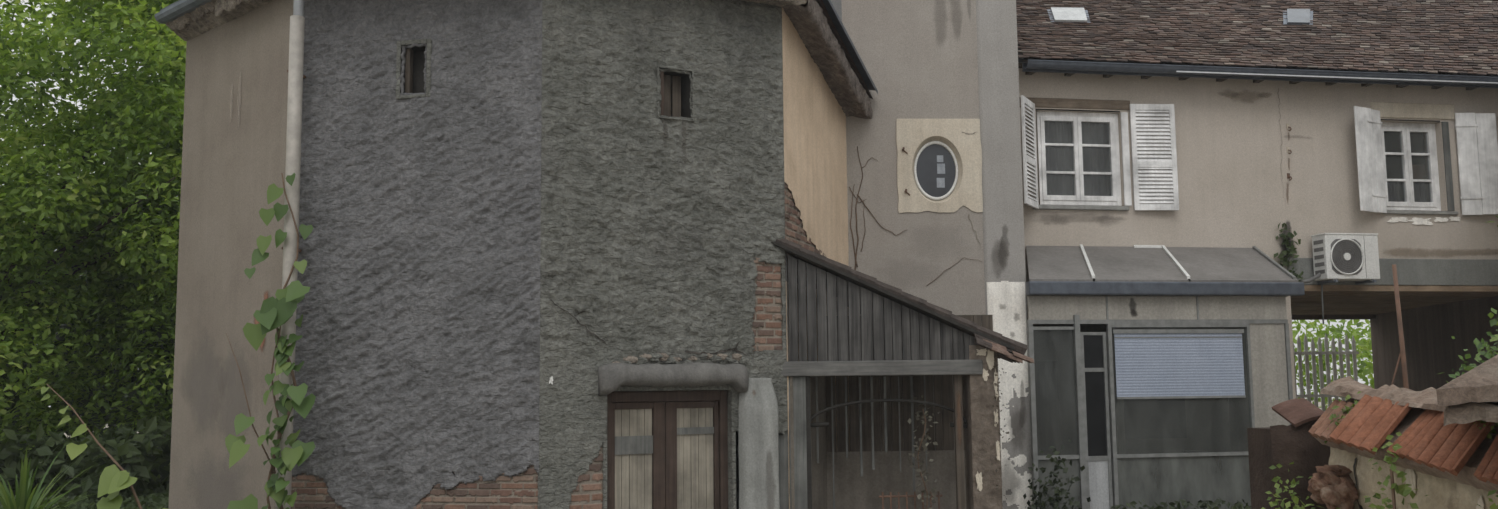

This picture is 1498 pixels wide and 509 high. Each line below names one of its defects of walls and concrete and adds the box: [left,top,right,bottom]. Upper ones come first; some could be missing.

spalling [612,182,826,365]
crack [550,299,612,346]
crack [685,341,755,355]
peeling [972,281,1034,509]
spalling [291,473,345,509]
spalling [413,465,538,509]
spalling [569,446,603,509]